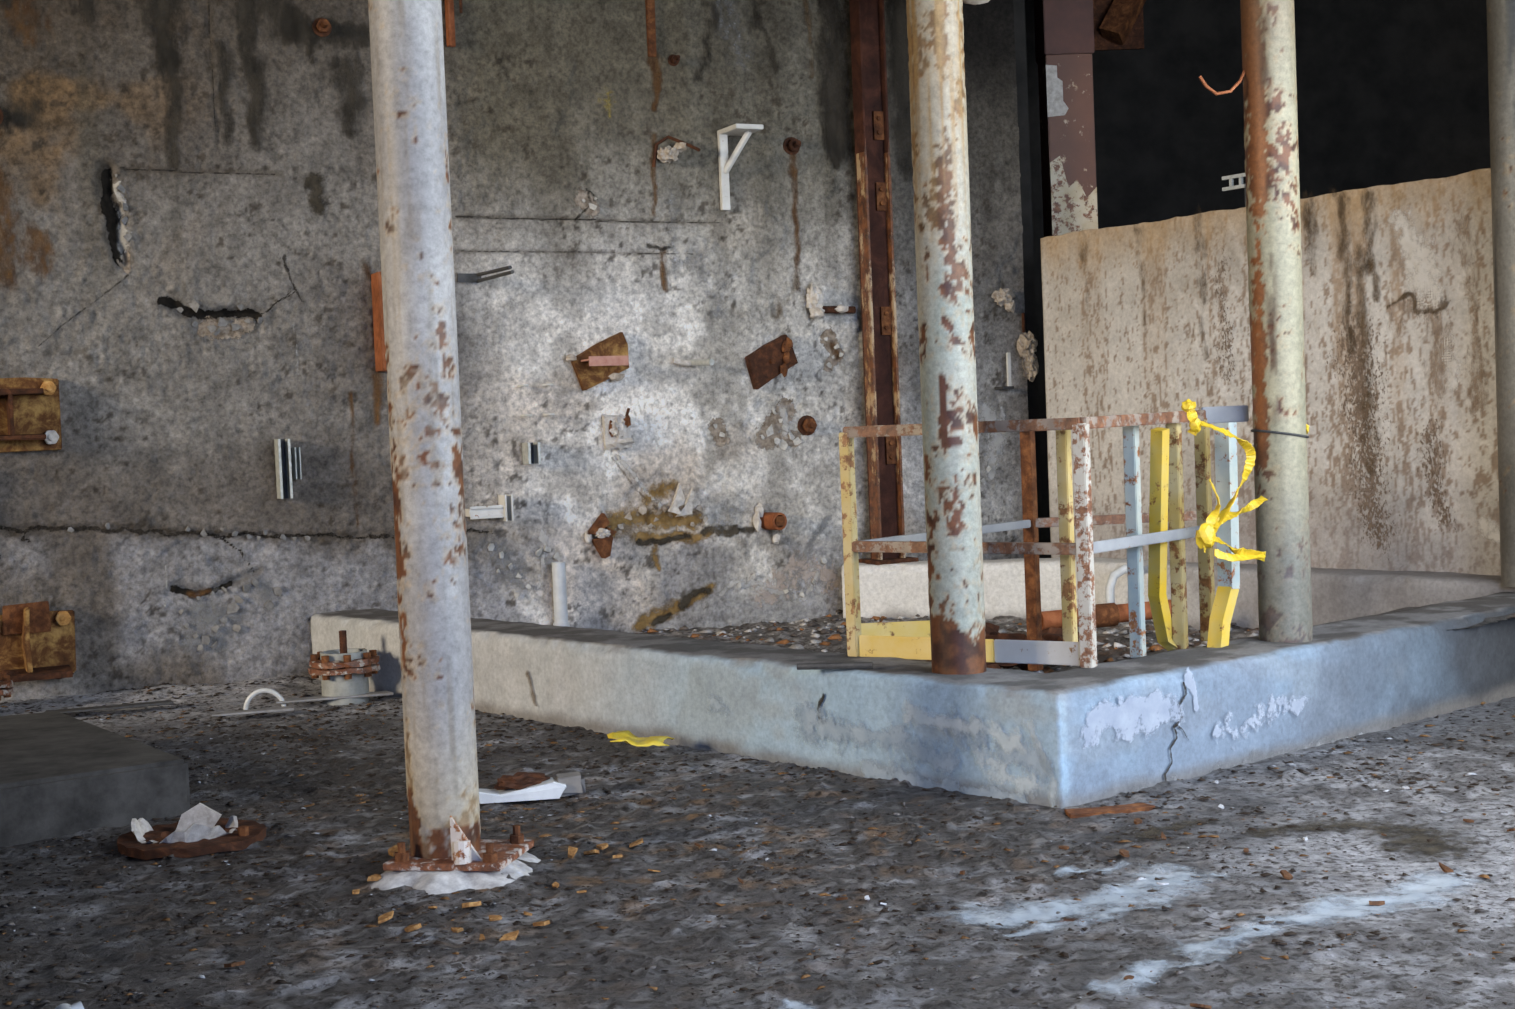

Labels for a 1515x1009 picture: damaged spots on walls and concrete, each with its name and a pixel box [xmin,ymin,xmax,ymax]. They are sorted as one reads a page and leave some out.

water stain [143,0,183,168]
water stain [216,0,370,148]
rust [788,155,801,288]
water stain [1210,248,1237,381]
water stain [1326,309,1457,560]
crack [0,523,394,606]
crack [1164,682,1189,781]